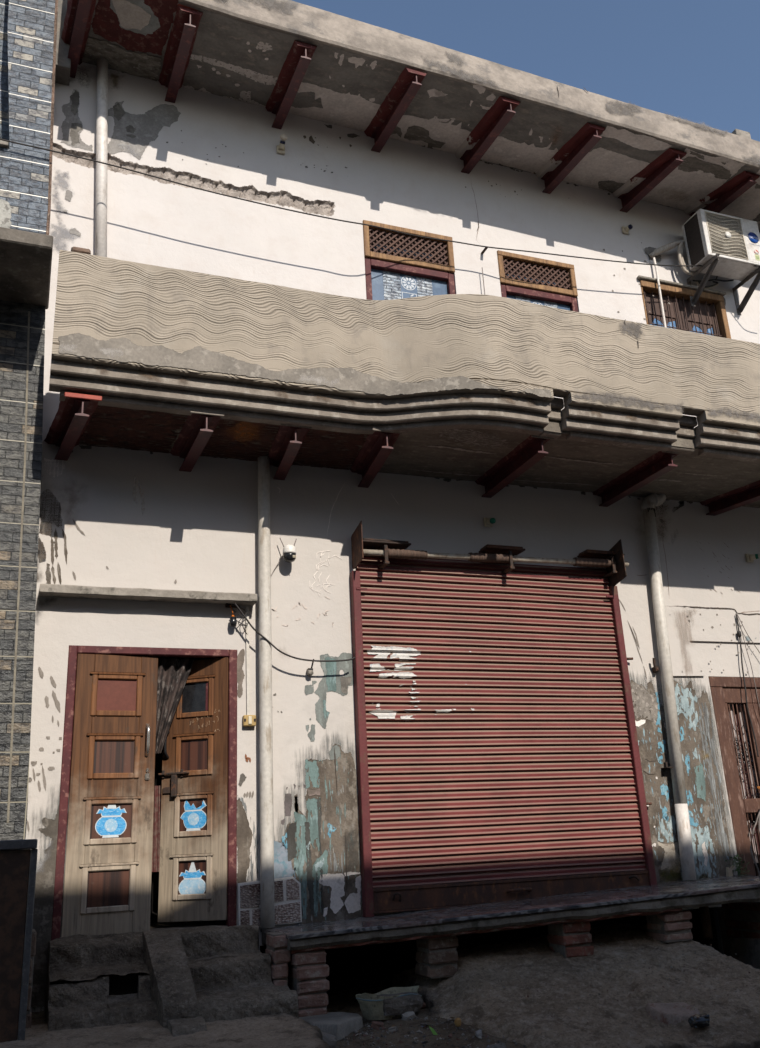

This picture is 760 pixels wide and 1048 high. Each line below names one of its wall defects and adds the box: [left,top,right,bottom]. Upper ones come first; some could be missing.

peeling [91,0,178,55]
spalling [53,90,335,217]
peeling [389,113,471,154]
peeling [479,128,558,174]
peeling [563,126,672,195]
peeling [641,148,745,210]
peeling [719,170,760,225]
peeling [38,489,85,584]
peeling [237,649,245,698]
peeling [274,653,362,924]
peeling [629,661,736,883]
peeling [237,773,258,883]